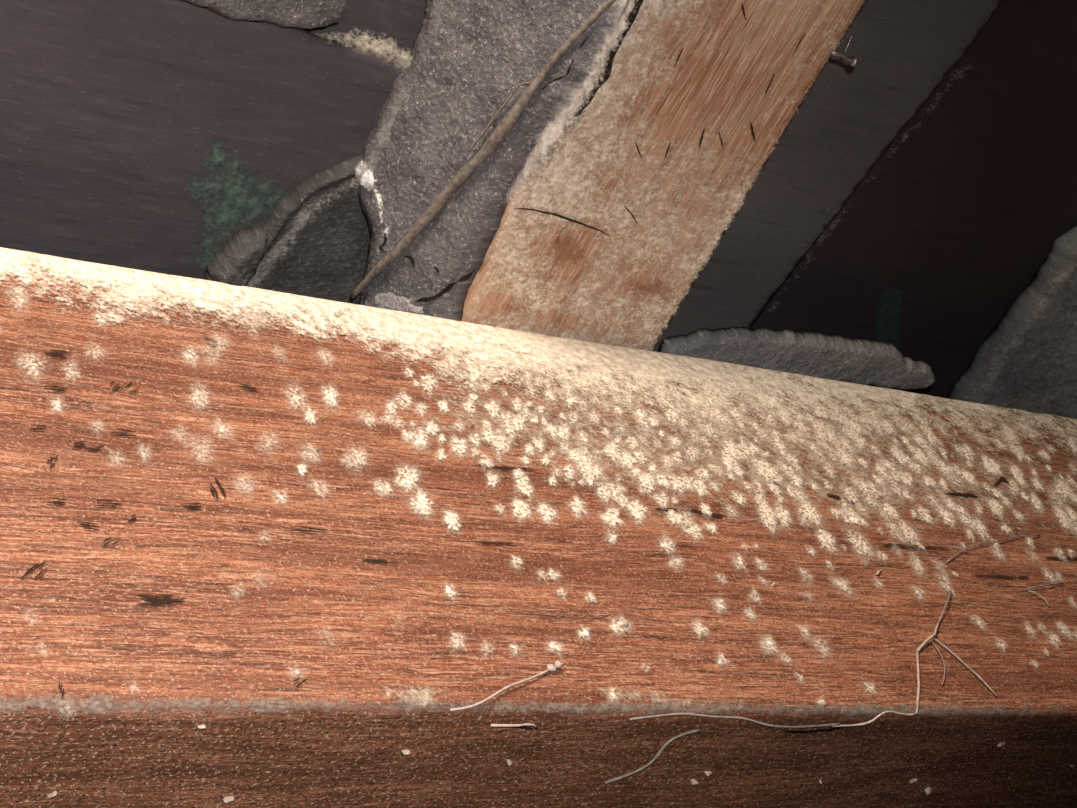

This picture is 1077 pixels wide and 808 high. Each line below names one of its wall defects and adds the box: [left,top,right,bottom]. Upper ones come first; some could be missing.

water stain [0,0,1077,571]
water stain [735,544,766,581]
water stain [611,617,629,632]
water stain [1026,622,1077,655]
water stain [0,696,371,713]
water stain [383,686,1063,718]